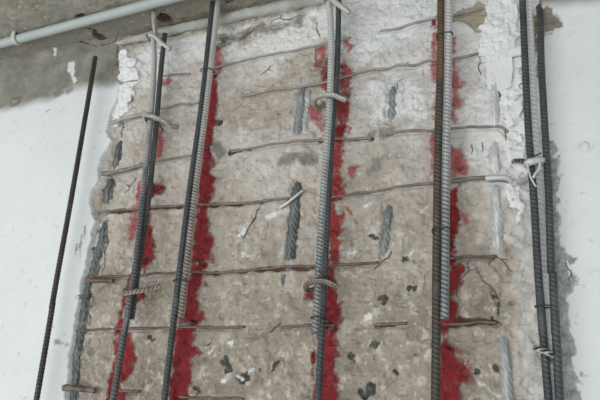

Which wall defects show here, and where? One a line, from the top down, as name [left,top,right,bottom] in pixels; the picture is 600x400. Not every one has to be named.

spalling [34,56,98,400]
spalling [69,116,191,400]
spalling [112,0,580,400]
crack [456,255,513,301]